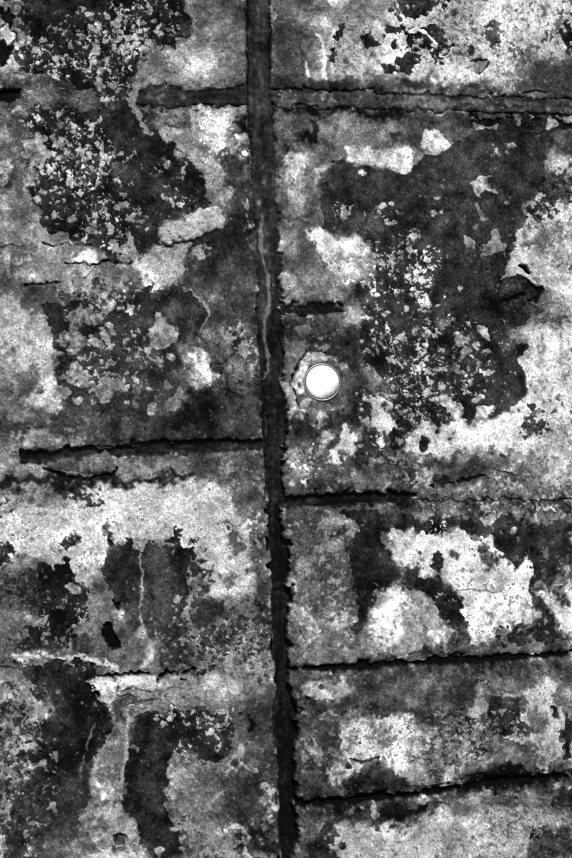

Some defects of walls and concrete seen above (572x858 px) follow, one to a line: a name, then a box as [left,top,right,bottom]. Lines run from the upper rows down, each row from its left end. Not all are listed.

water stain [344,129,451,175]
efflorescence [305,227,379,292]
peeling [290,112,572,464]
water stain [355,392,397,448]
water stain [403,394,552,462]
water stain [358,527,572,659]
water stain [14,651,120,672]